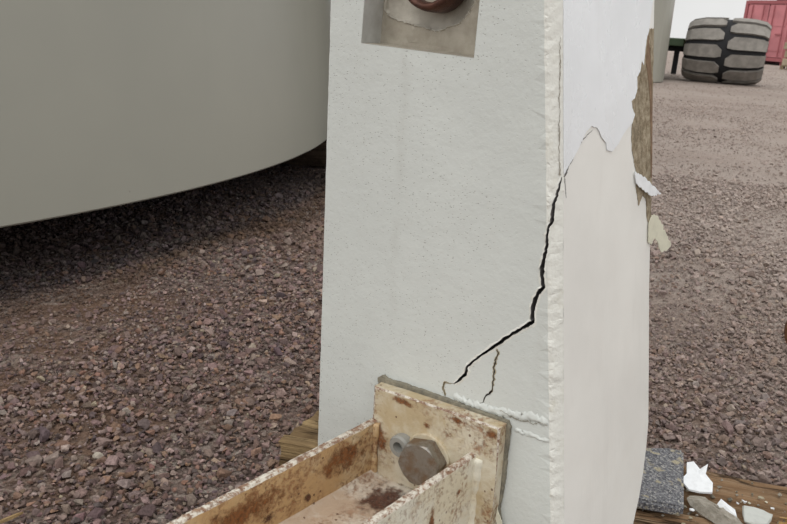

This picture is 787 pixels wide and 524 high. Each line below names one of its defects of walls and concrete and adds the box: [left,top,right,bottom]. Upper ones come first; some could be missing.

peeling [563,0,671,252]
crack [442,37,592,426]
rust [323,441,364,478]
rust [211,489,283,524]
rust [359,487,405,512]